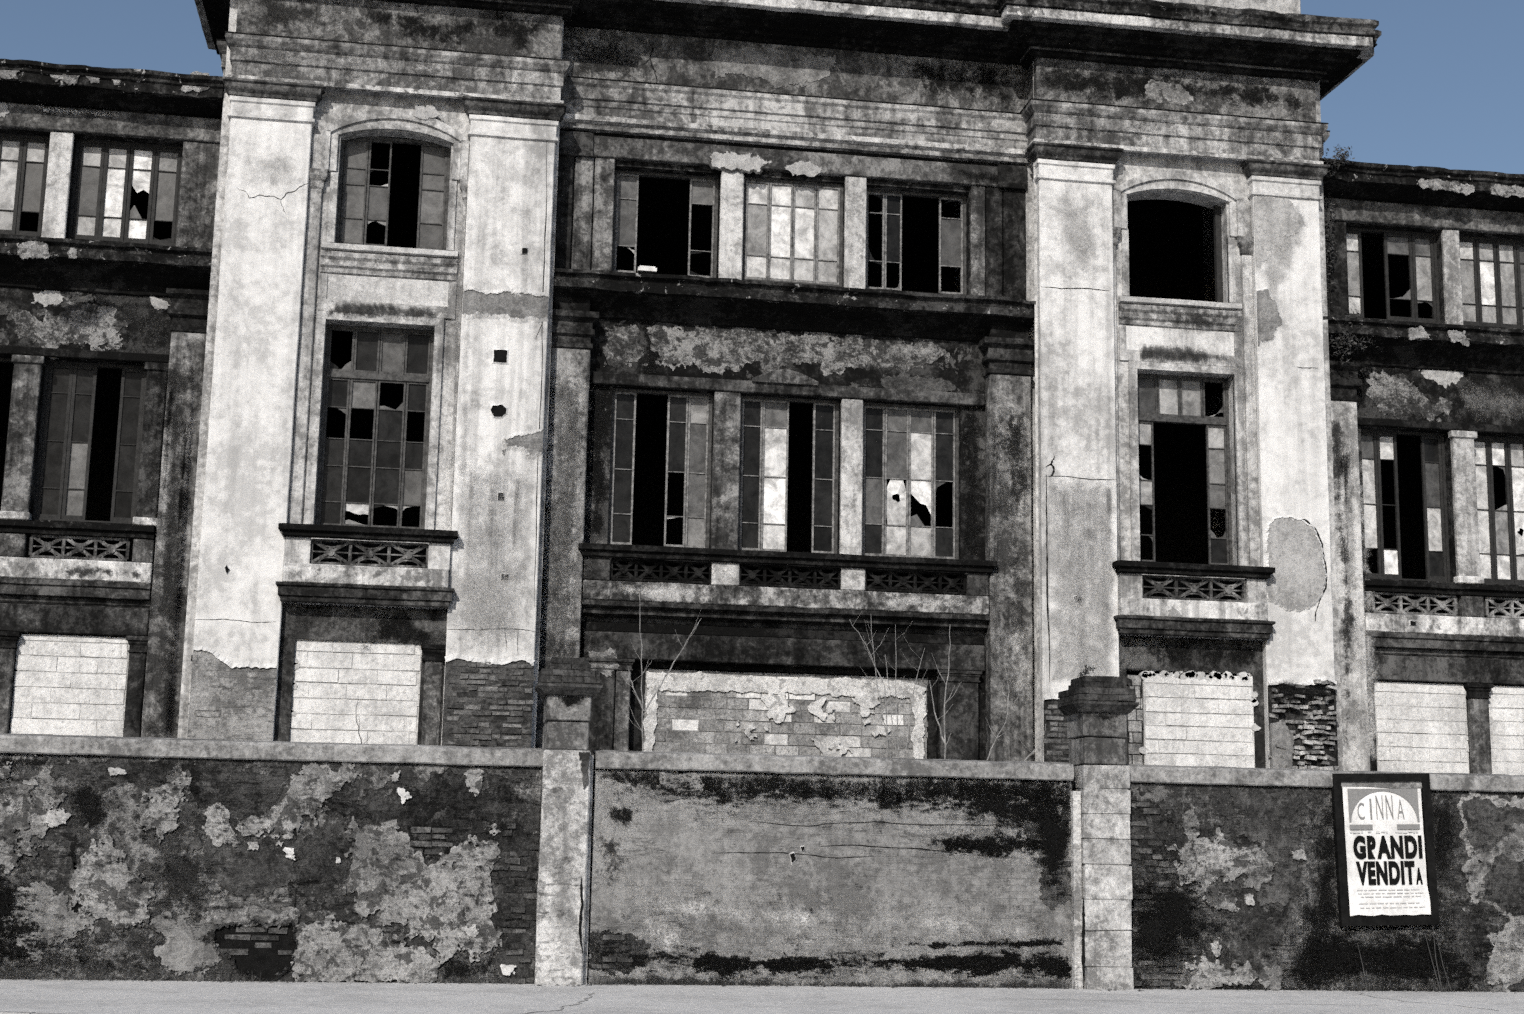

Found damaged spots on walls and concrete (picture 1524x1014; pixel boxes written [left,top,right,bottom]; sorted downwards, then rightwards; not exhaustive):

crack [239,183,308,212]
peeling [1418,178,1524,198]
flaking render [0,290,129,360]
flaking render [602,322,956,392]
flaking render [1366,369,1464,422]
flaking render [1264,515,1328,613]
flaking render [187,645,277,741]
flaking render [442,653,536,748]
water stain [601,770,1071,809]
flaking render [1226,676,1341,907]
flaking render [0,754,540,984]
water stain [942,839,1014,859]